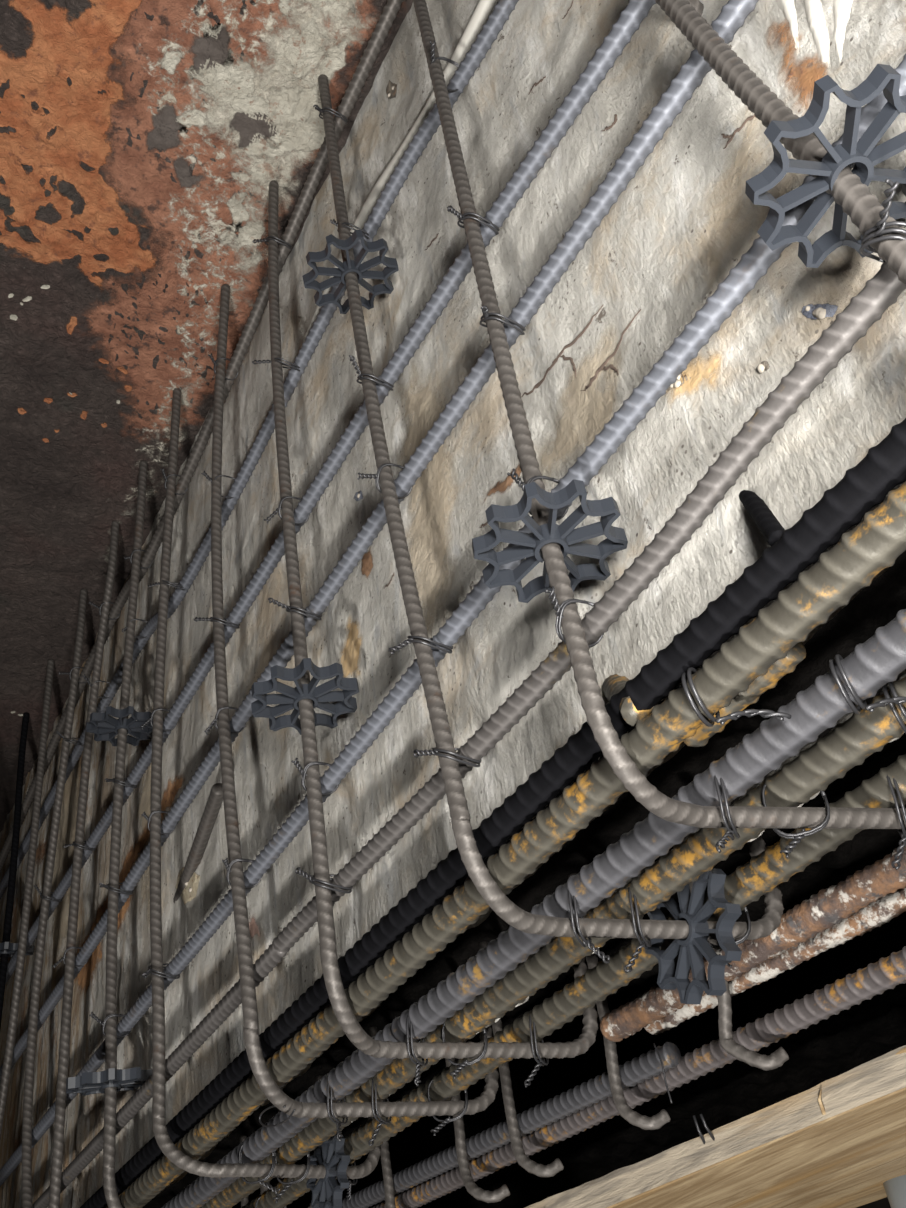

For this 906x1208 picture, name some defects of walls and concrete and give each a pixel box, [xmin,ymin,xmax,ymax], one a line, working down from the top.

spalling [711,0,759,44]
spalling [503,49,712,350]
crack [522,305,641,397]
spalling [0,0,656,1081]